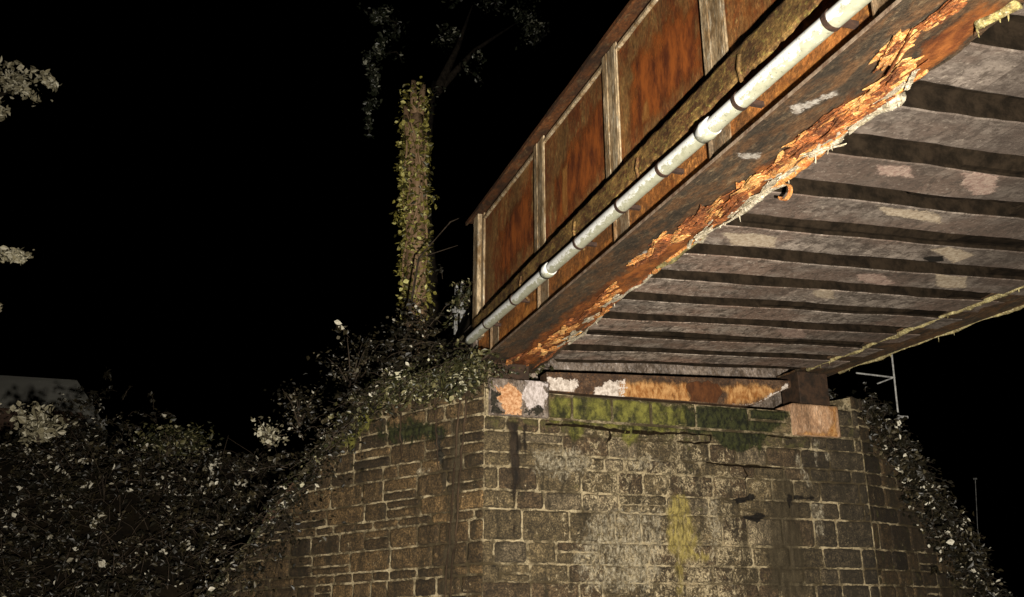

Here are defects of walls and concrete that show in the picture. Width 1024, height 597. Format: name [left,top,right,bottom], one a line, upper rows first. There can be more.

spalling [626,0,967,267]
peeling [923,247,974,288]
peeling [495,376,579,415]
peeling [593,379,627,397]
leakage [507,421,584,500]
leakage [577,494,718,593]